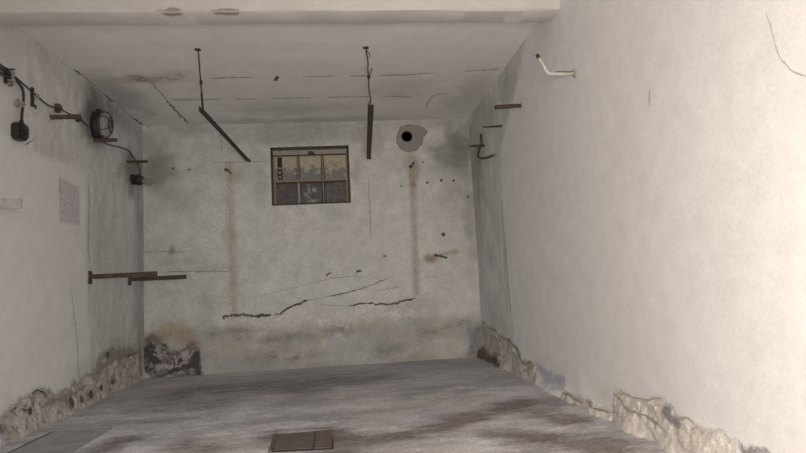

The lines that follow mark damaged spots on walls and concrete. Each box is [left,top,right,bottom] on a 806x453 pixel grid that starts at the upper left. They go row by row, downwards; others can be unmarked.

crack [766,14,806,77]
crack [124,76,219,124]
crack [223,276,416,319]
spalling [477,321,538,384]
spalling [0,337,204,447]
spalling [561,389,769,453]